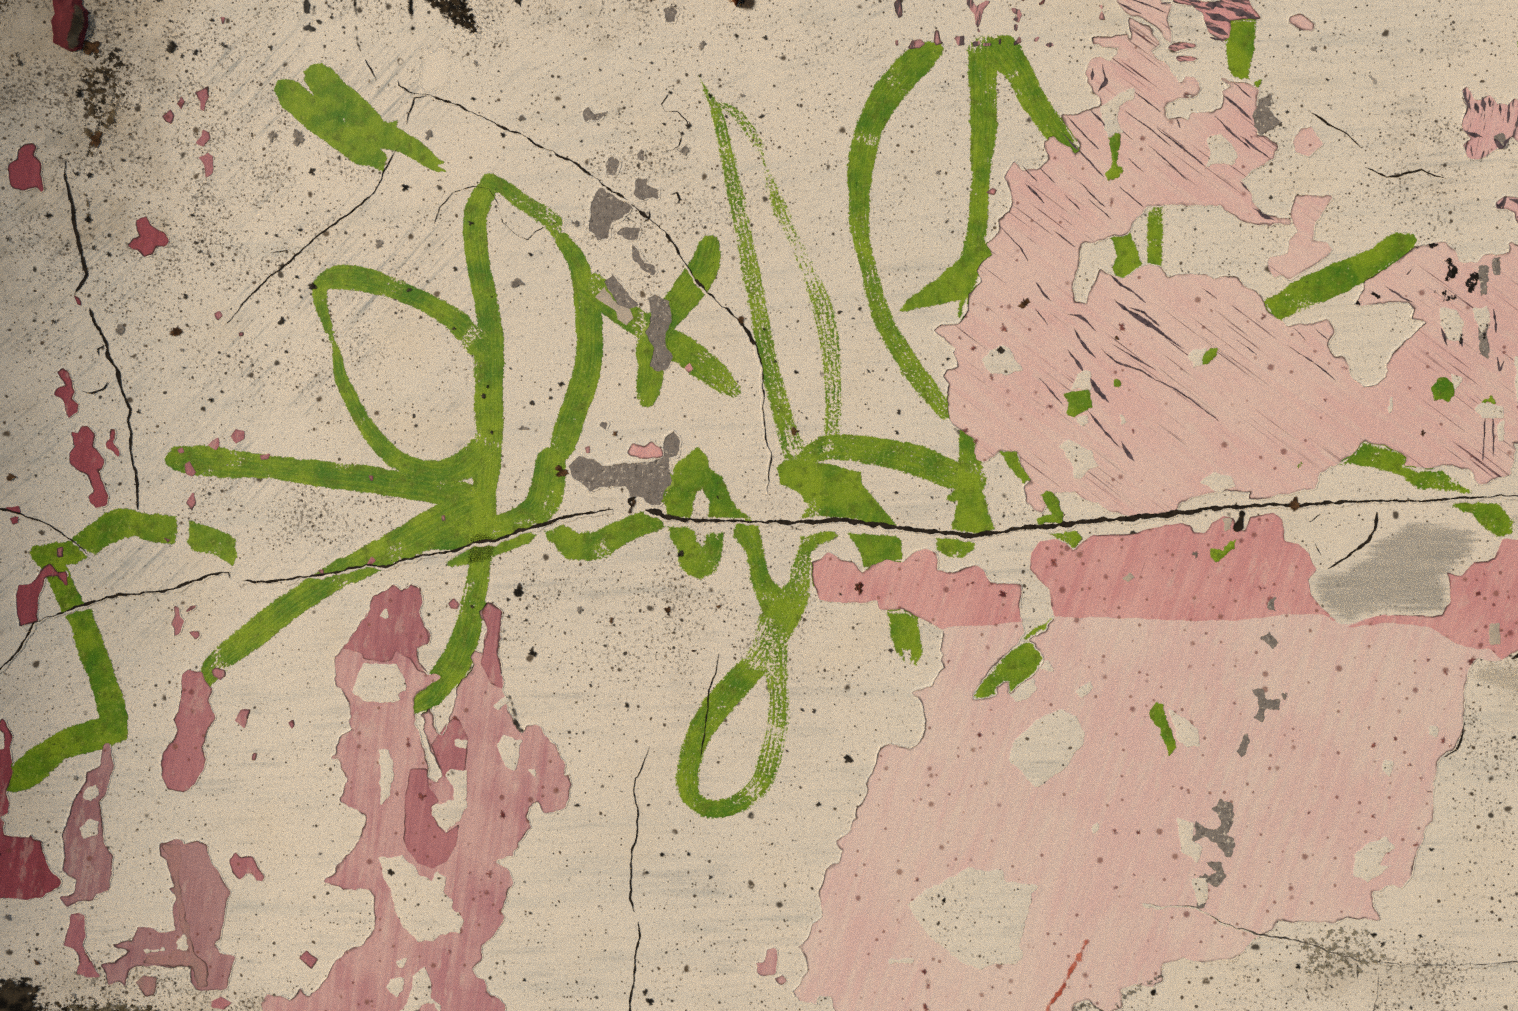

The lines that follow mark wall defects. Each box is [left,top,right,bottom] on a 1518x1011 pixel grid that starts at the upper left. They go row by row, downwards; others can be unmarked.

peeling [7,143,45,193]
peeling [128,216,170,258]
crack [0,60,1518,675]
peeling [53,367,120,509]
peeling [178,448,196,511]
peeling [756,0,1518,1011]
peeling [160,667,225,793]
peeling [235,709,250,728]
crack [700,653,719,757]
peeling [260,583,579,1011]
crack [629,748,649,1011]
crack [1142,903,1518,1011]